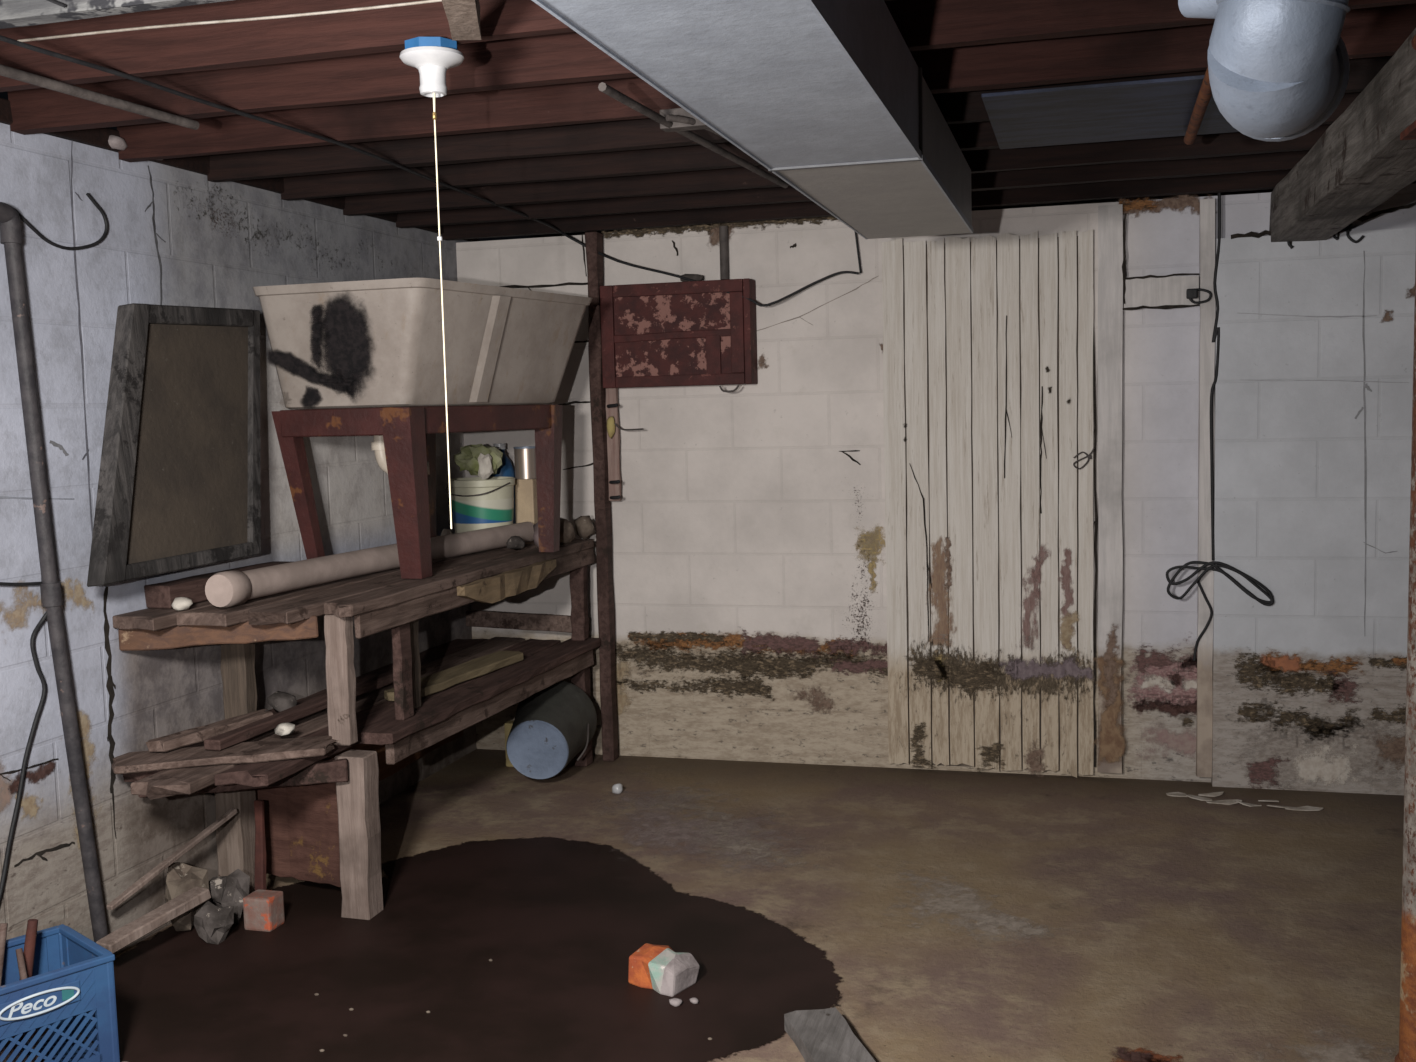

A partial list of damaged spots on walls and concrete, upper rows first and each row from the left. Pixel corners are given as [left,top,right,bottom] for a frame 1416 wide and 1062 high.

leakage [855,527,885,593]
peeling [0,586,46,629]
peeling [61,579,91,608]
leakage [615,537,1197,768]
leakage [1231,653,1406,740]
peeling [69,710,95,848]
leakage [976,743,1005,774]
leakage [1024,747,1047,777]
leakage [113,787,843,1062]
rust [1112,1046,1182,1062]